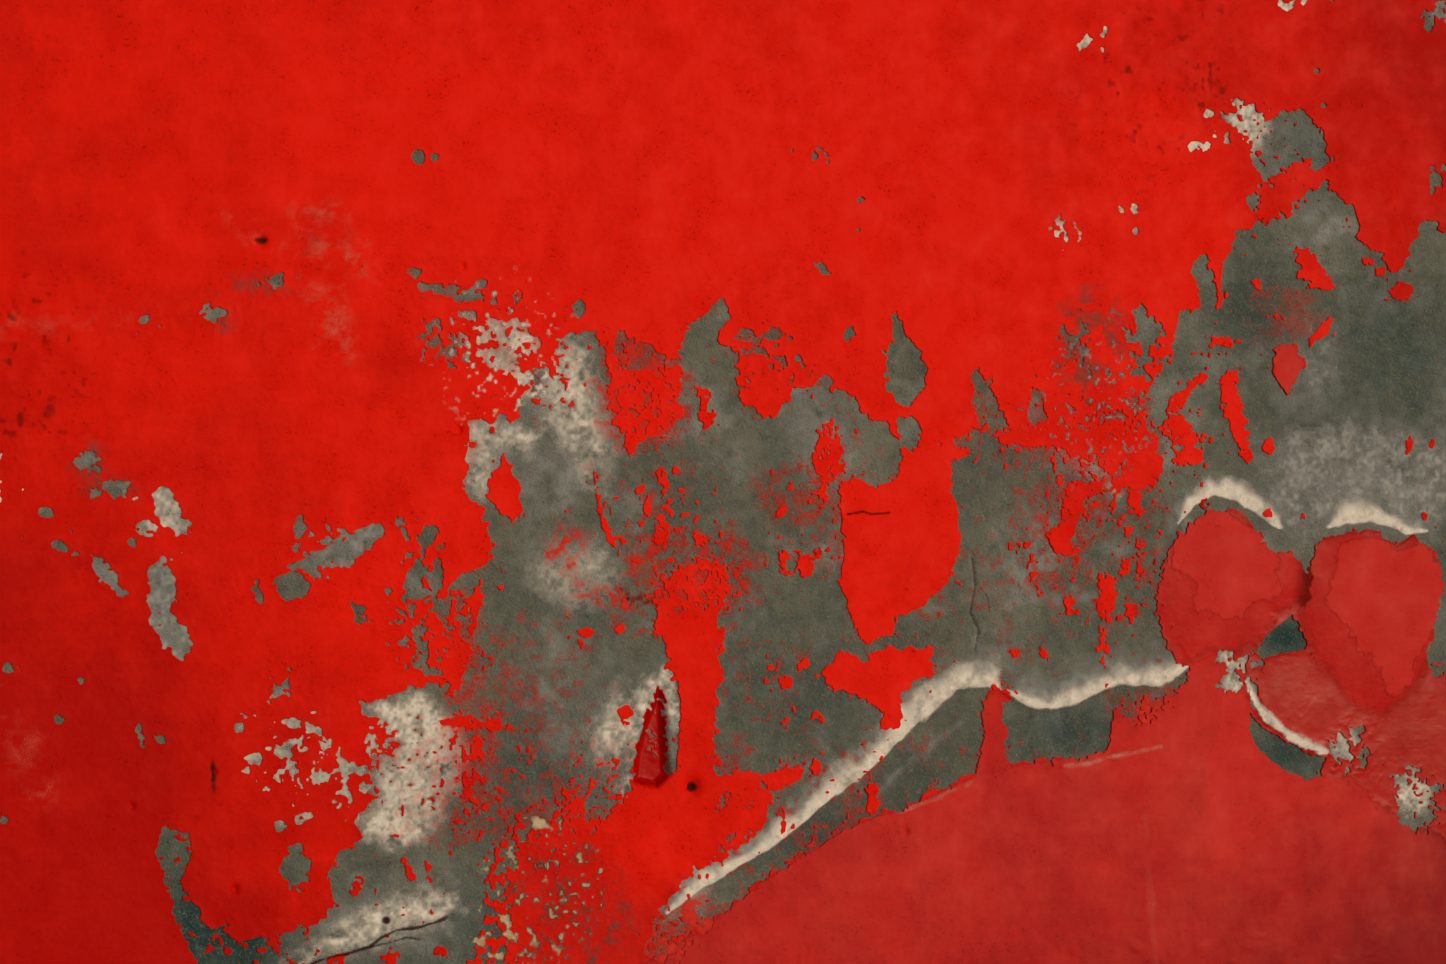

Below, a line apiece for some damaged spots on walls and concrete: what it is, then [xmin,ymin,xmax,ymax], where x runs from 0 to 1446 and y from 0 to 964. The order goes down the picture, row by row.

peeling [1420,0,1446,32]
peeling [411,149,439,165]
peeling [1220,98,1334,211]
peeling [1429,163,1446,194]
peeling [73,450,131,500]
peeling [38,507,54,518]
peeling [128,486,192,547]
peeling [51,530,126,597]
peeling [155,179,1446,964]
peeling [148,561,192,658]
peeling [135,723,166,748]
crack [311,917,447,964]